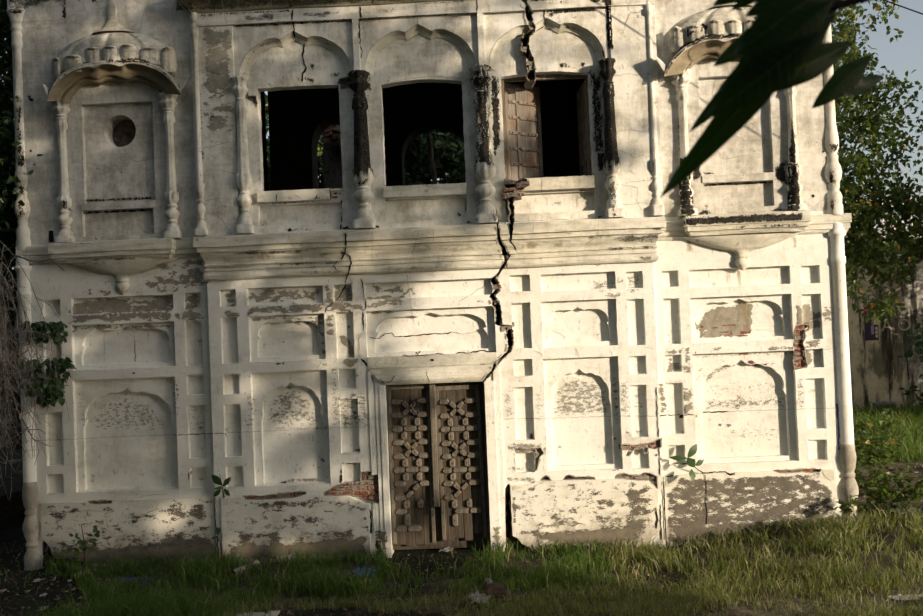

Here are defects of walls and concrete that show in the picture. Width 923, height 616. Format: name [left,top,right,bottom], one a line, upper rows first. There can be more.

crack [271,0,307,82]
crack [520,0,546,89]
damp [353,75,371,186]
damp [473,69,501,165]
damp [560,63,617,218]
damp [679,119,803,229]
peeling [68,259,207,333]
crack [276,191,534,384]
flaking render [667,303,833,418]
flaking render [226,463,379,556]
peeling [505,433,658,550]
peeling [667,468,835,542]